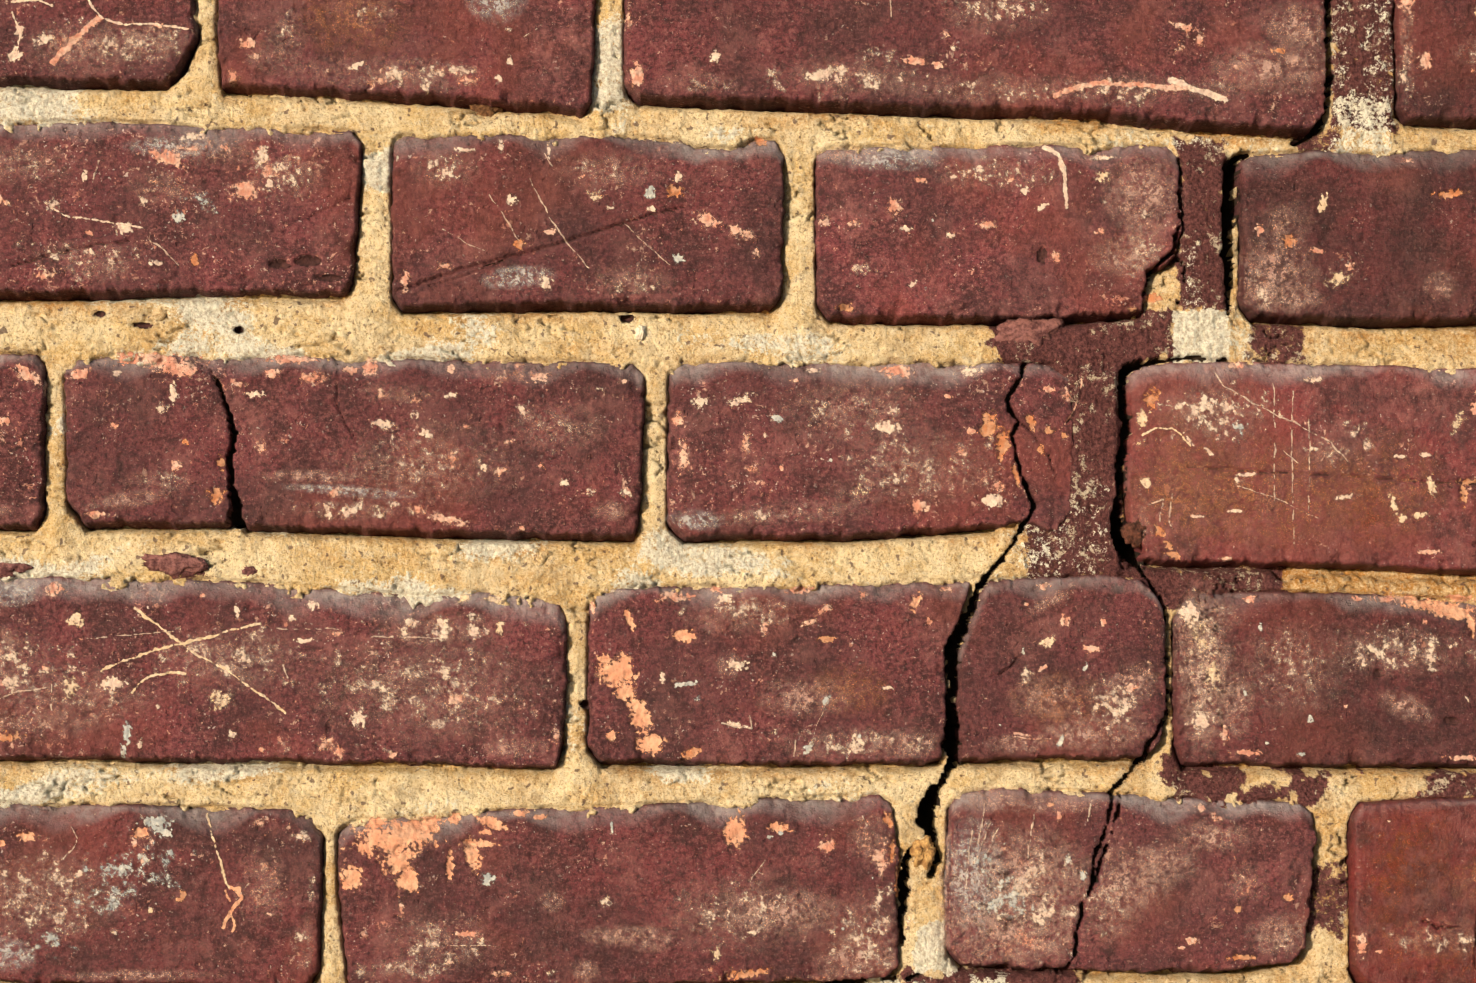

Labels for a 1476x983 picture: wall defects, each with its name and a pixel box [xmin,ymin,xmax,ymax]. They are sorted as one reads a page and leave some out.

crack [1291,0,1335,146]
crack [1142,160,1184,307]
crack [1219,154,1249,315]
crack [213,376,246,525]
crack [825,364,1081,983]
crack [1066,355,1227,966]